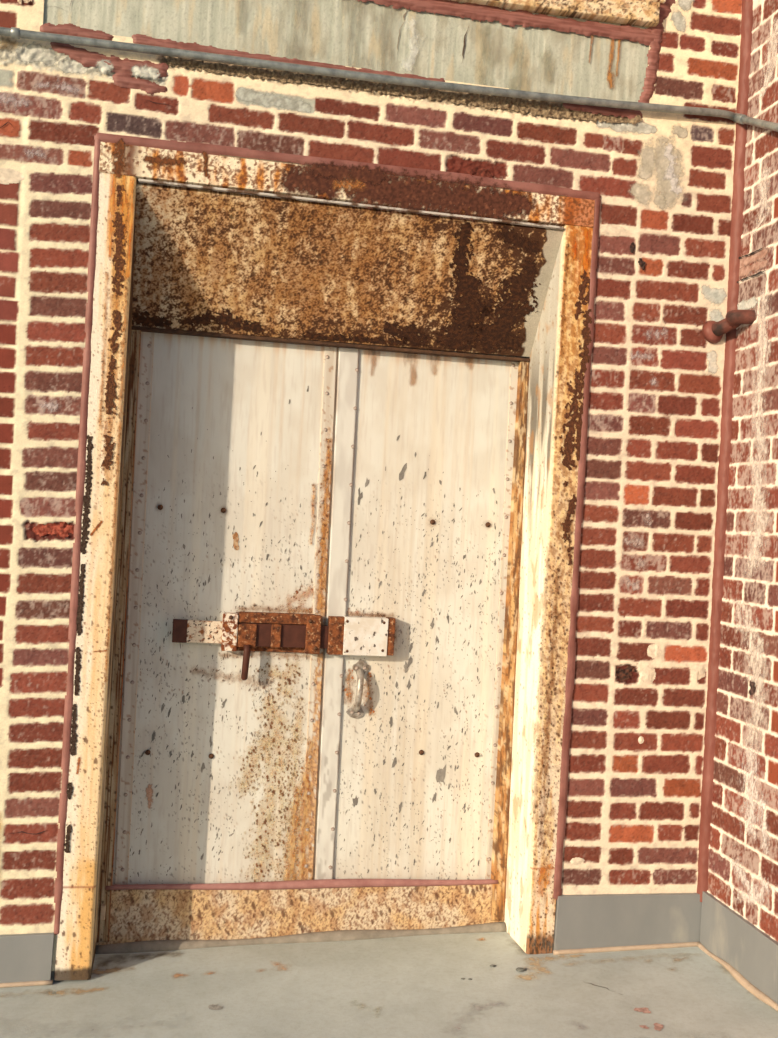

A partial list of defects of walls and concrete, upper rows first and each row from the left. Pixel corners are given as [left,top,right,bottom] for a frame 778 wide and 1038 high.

corrosion [607,38,621,89]
efflorescence [759,19,778,98]
corrosion [90,138,265,541]
corrosion [281,161,541,366]
corrosion [560,229,590,326]
efflorescence [748,292,770,575]
efflorescence [754,167,770,233]
corrosion [209,651,313,882]
corrosion [532,551,561,843]
efflorescence [736,600,768,854]
efflorescence [732,862,771,904]